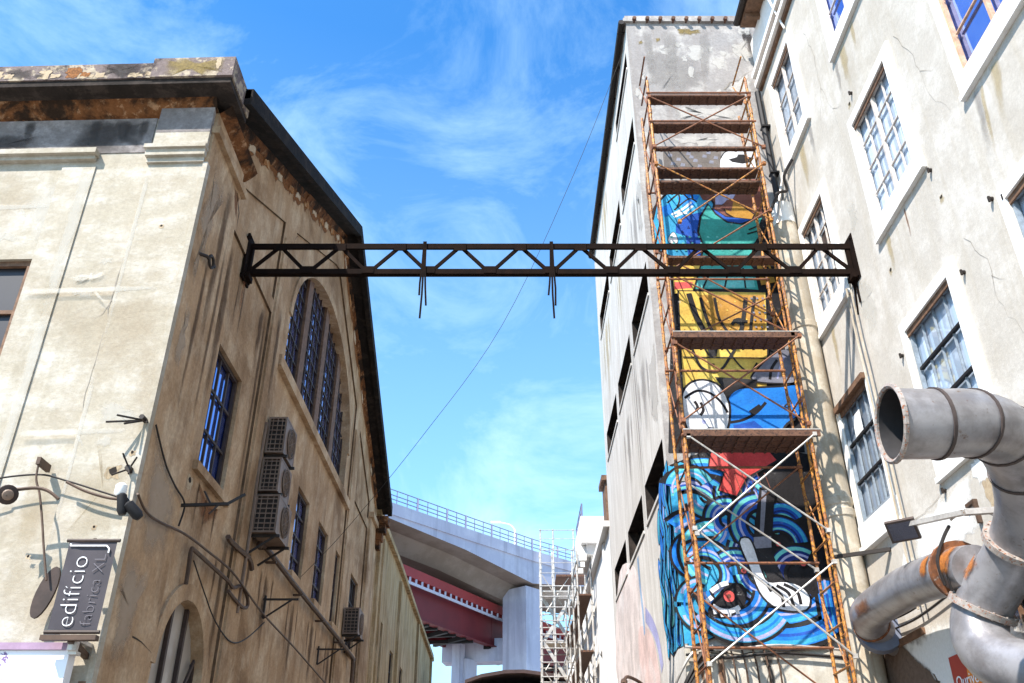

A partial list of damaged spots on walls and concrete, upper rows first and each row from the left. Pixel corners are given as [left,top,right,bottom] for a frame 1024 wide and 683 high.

peeling [37,70,61,79]
peeling [659,28,752,92]
damp [249,315,279,423]